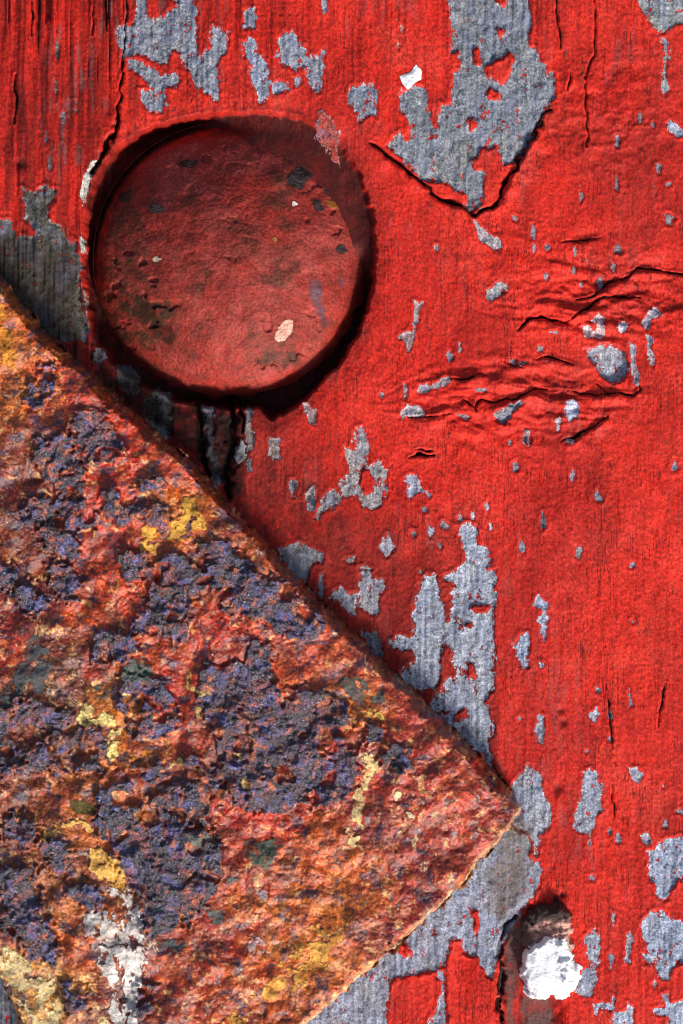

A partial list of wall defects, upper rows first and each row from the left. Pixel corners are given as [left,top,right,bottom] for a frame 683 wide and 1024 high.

peeling [115,0,327,113]
crack [369,109,552,217]
peeling [388,0,555,254]
crack [518,267,683,330]
peeling [288,425,389,521]
rust [140,495,207,555]
peeling [360,502,498,767]
rust [76,703,159,762]
rust [186,672,212,719]
rust [42,817,126,893]
peeling [307,766,683,1024]
rust [225,924,343,1024]